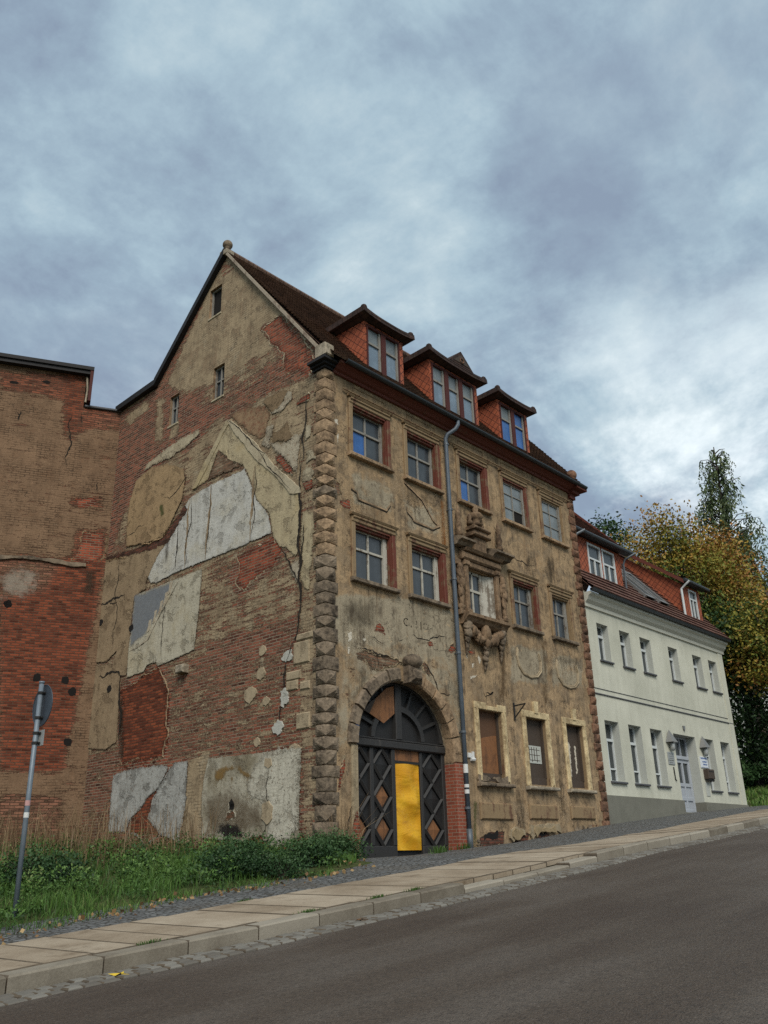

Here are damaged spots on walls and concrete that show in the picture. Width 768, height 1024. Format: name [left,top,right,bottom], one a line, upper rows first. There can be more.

flaking render [260,314,314,376]
crack [65,416,82,465]
flaking render [235,538,282,591]
crack [228,392,308,718]
flaking render [348,623,403,671]
flaking render [107,667,172,842]
flaking render [477,830,549,847]